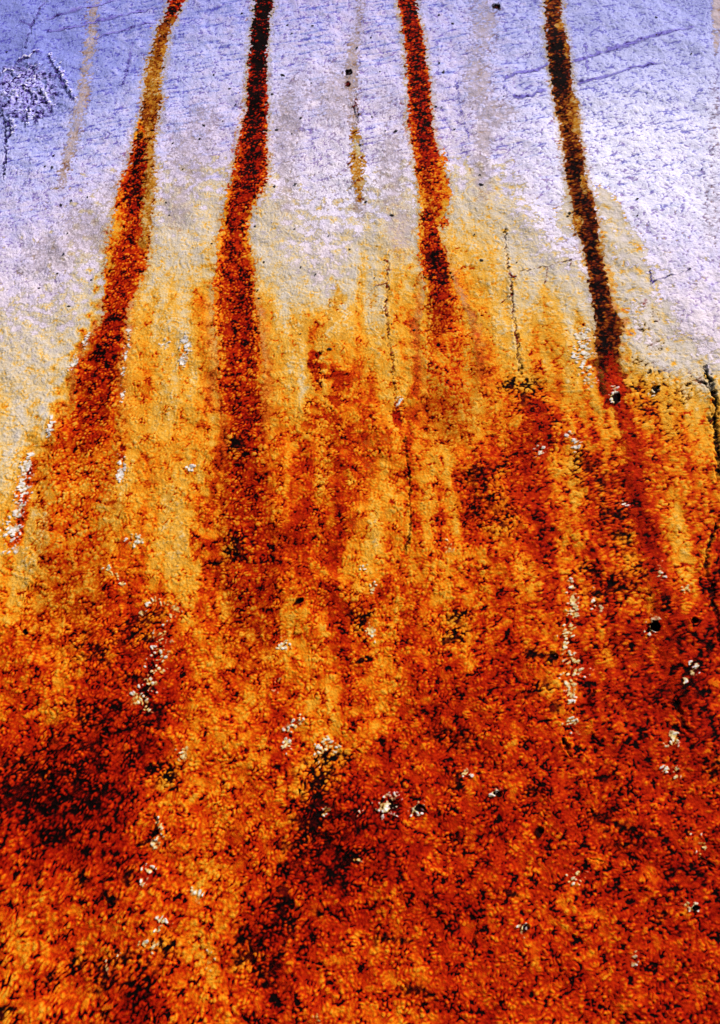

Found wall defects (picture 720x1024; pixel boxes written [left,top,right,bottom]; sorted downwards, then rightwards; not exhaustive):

rust [642,258,672,295]
rust [649,630,665,644]